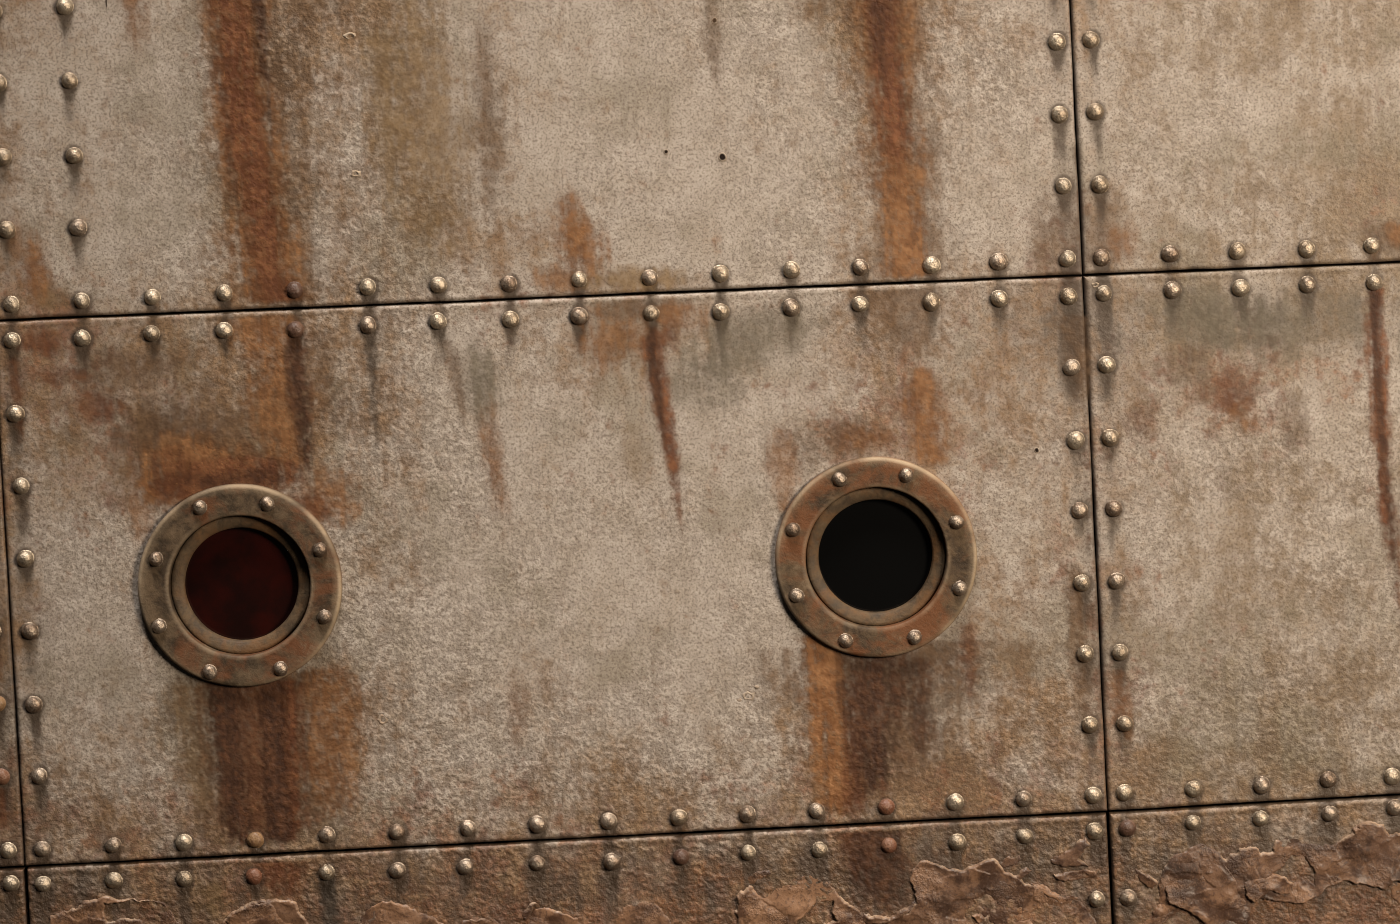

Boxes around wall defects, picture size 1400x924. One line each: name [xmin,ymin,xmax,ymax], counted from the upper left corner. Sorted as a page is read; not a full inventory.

rust [857,0,927,351]
rust [123,0,355,524]
rust [643,330,680,501]
rust [904,368,947,463]
rust [1365,289,1400,566]
rust [193,669,358,844]
rust [785,635,980,814]
rust [49,896,179,924]
rust [222,863,309,924]
rust [360,901,444,924]
rust [522,902,578,924]
rust [735,832,1097,924]